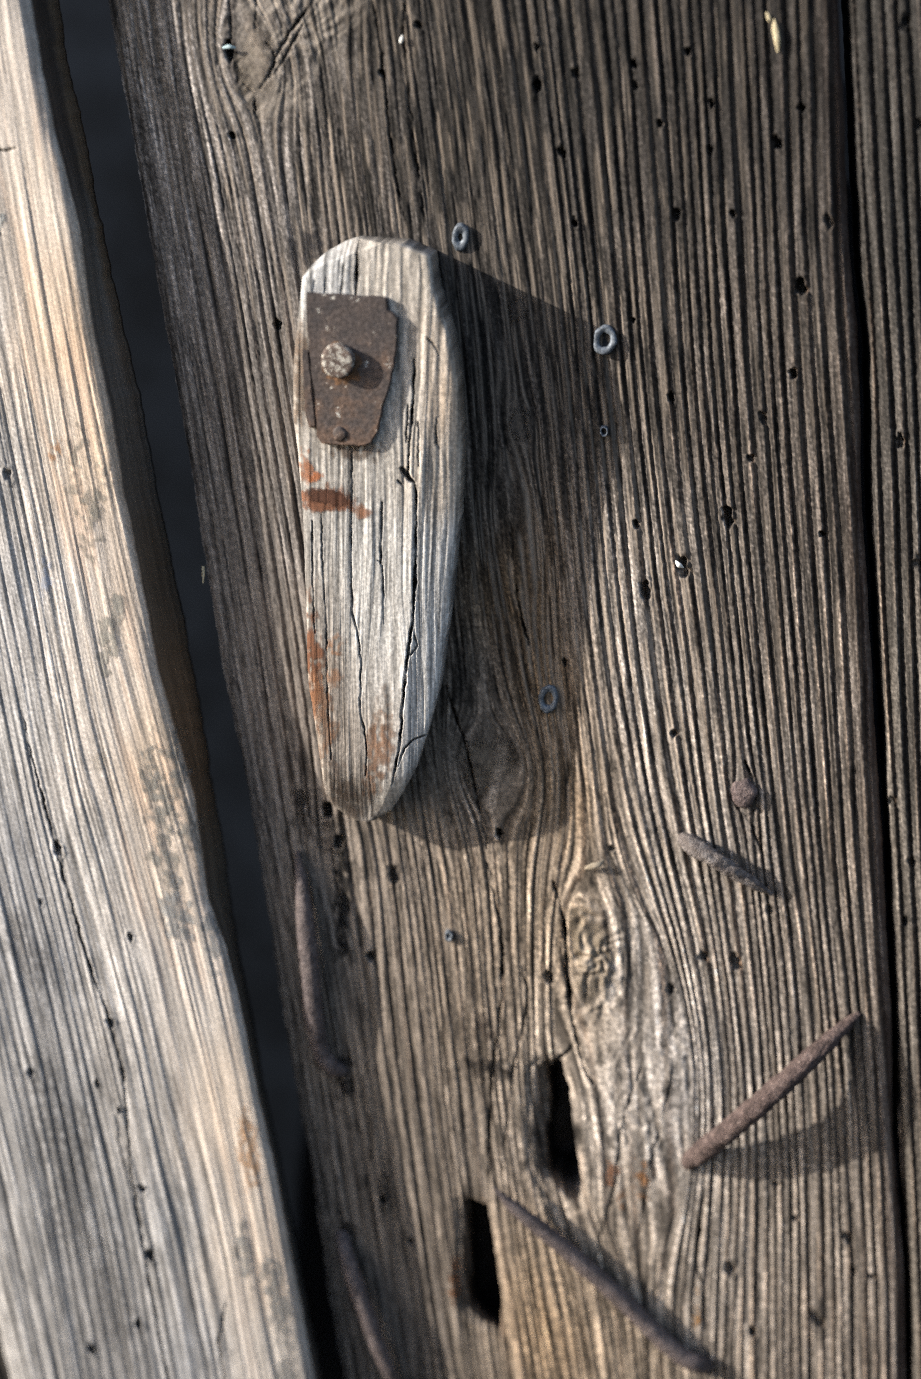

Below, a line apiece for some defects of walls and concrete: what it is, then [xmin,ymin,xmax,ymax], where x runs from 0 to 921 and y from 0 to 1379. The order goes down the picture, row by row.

rust [294,334,307,422]
rust [321,353,363,386]
rust [299,449,369,519]
crack [311,371,437,769]
rust [307,597,340,750]
rust [363,711,393,798]
crack [446,686,489,868]